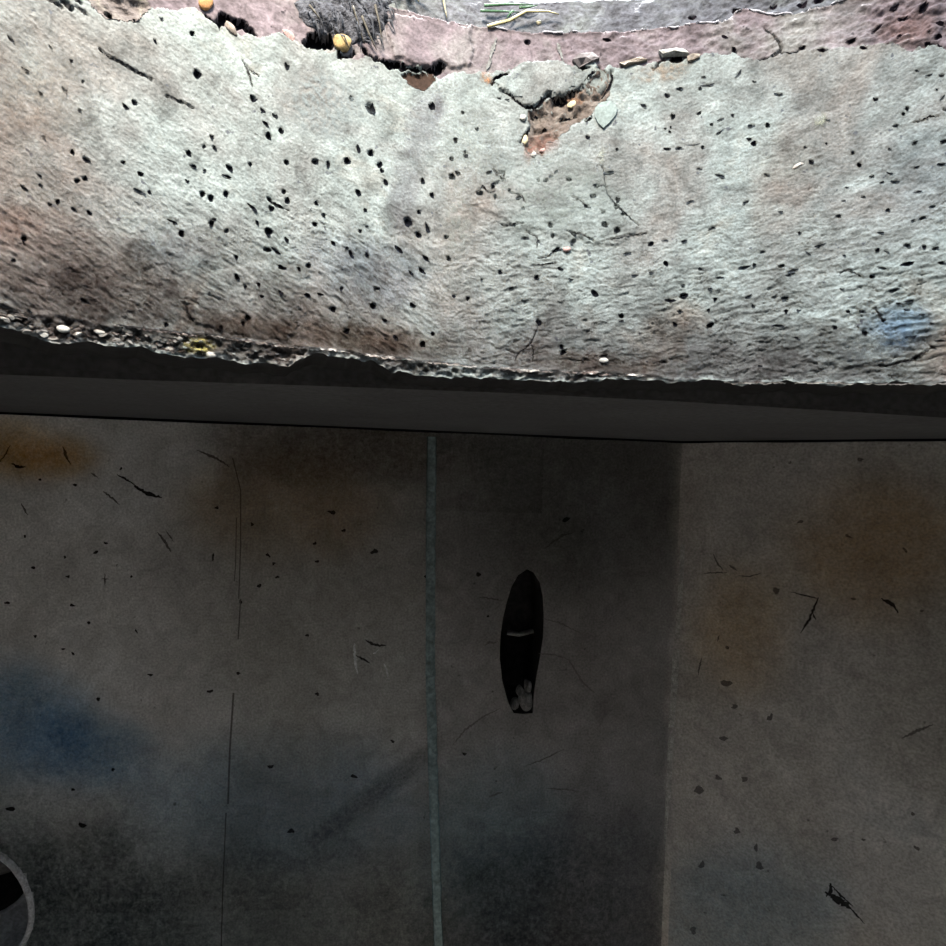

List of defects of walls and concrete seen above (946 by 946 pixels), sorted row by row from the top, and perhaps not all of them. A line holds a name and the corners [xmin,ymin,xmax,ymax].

crack [49,0,88,15]
spalling [89,0,151,23]
spalling [205,13,256,36]
crack [100,51,150,79]
spalling [523,52,618,156]
crack [476,167,556,266]
crack [566,167,647,240]